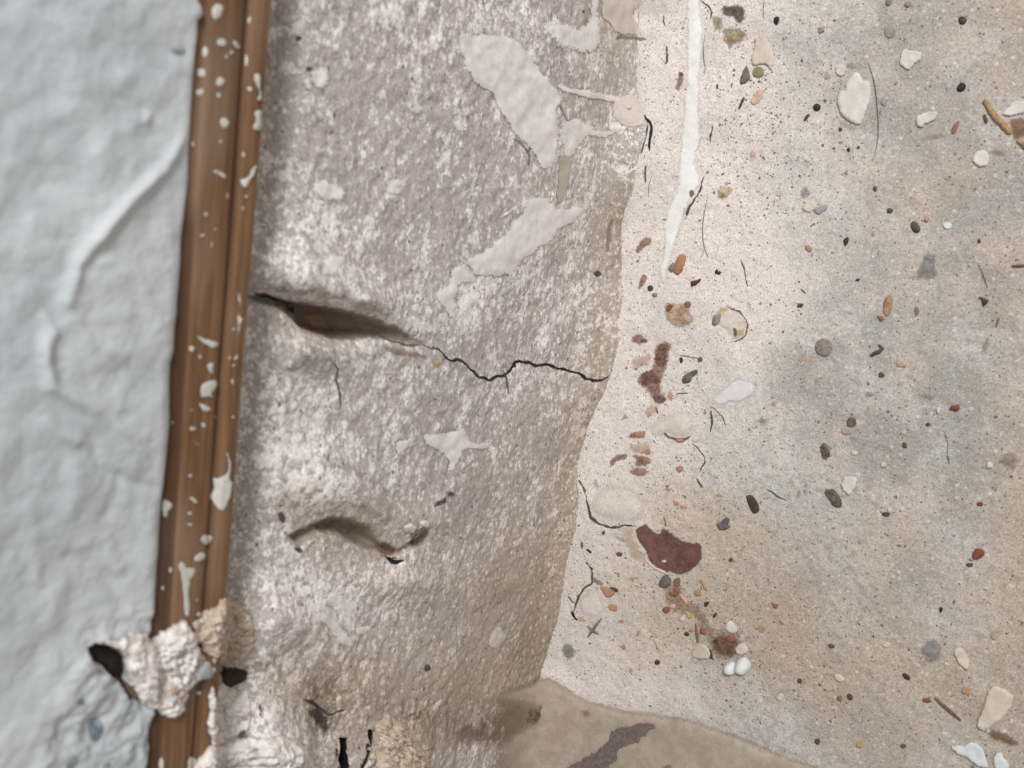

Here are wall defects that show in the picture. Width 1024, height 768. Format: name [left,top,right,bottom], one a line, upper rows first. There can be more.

peeling [435,0,646,317]
crack [334,361,342,407]
crack [380,335,608,394]
spalling [88,596,257,718]